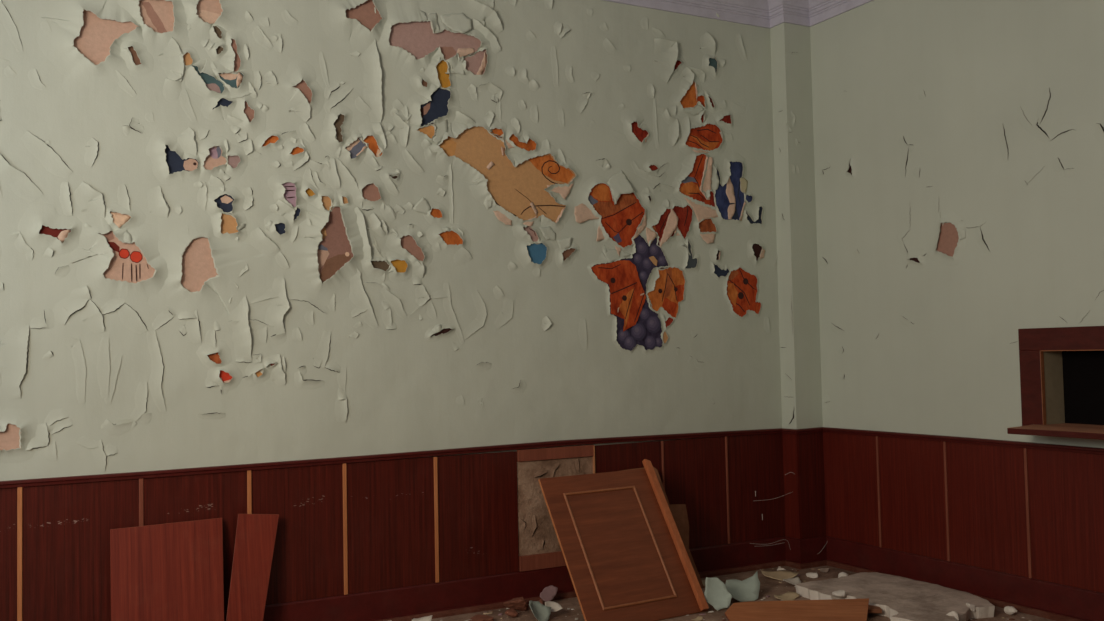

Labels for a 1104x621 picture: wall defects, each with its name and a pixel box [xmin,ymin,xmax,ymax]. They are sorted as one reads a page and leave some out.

peeling [17,0,766,391]
crack [899,136,920,178]
peeling [903,210,968,270]
crack [976,227,990,255]
crack [998,87,1104,178]
peeling [0,324,50,464]
flaking render [517,456,593,556]